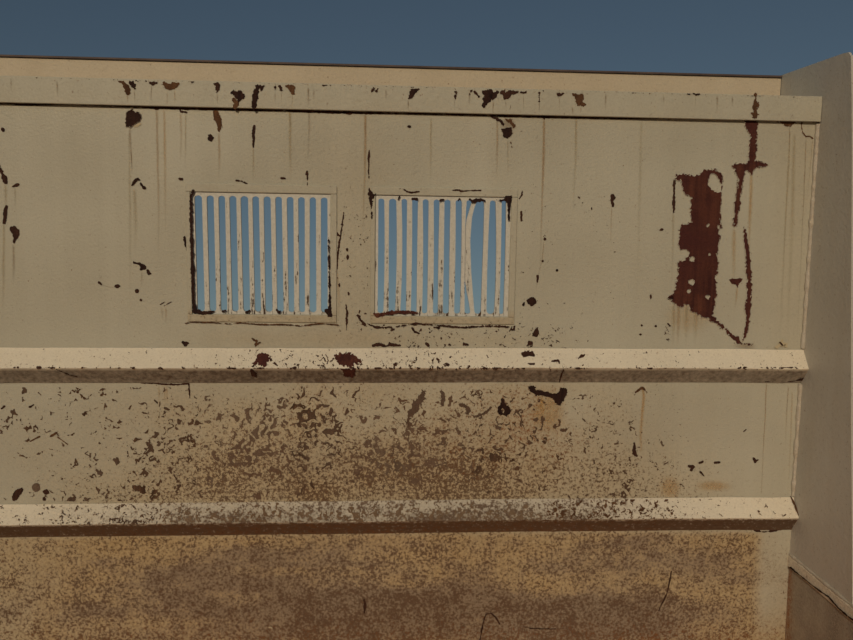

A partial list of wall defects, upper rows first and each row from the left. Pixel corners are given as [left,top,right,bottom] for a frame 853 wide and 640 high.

peeling [3,205,19,243]
corrosion [667,93,768,345]
peeling [0,386,706,525]